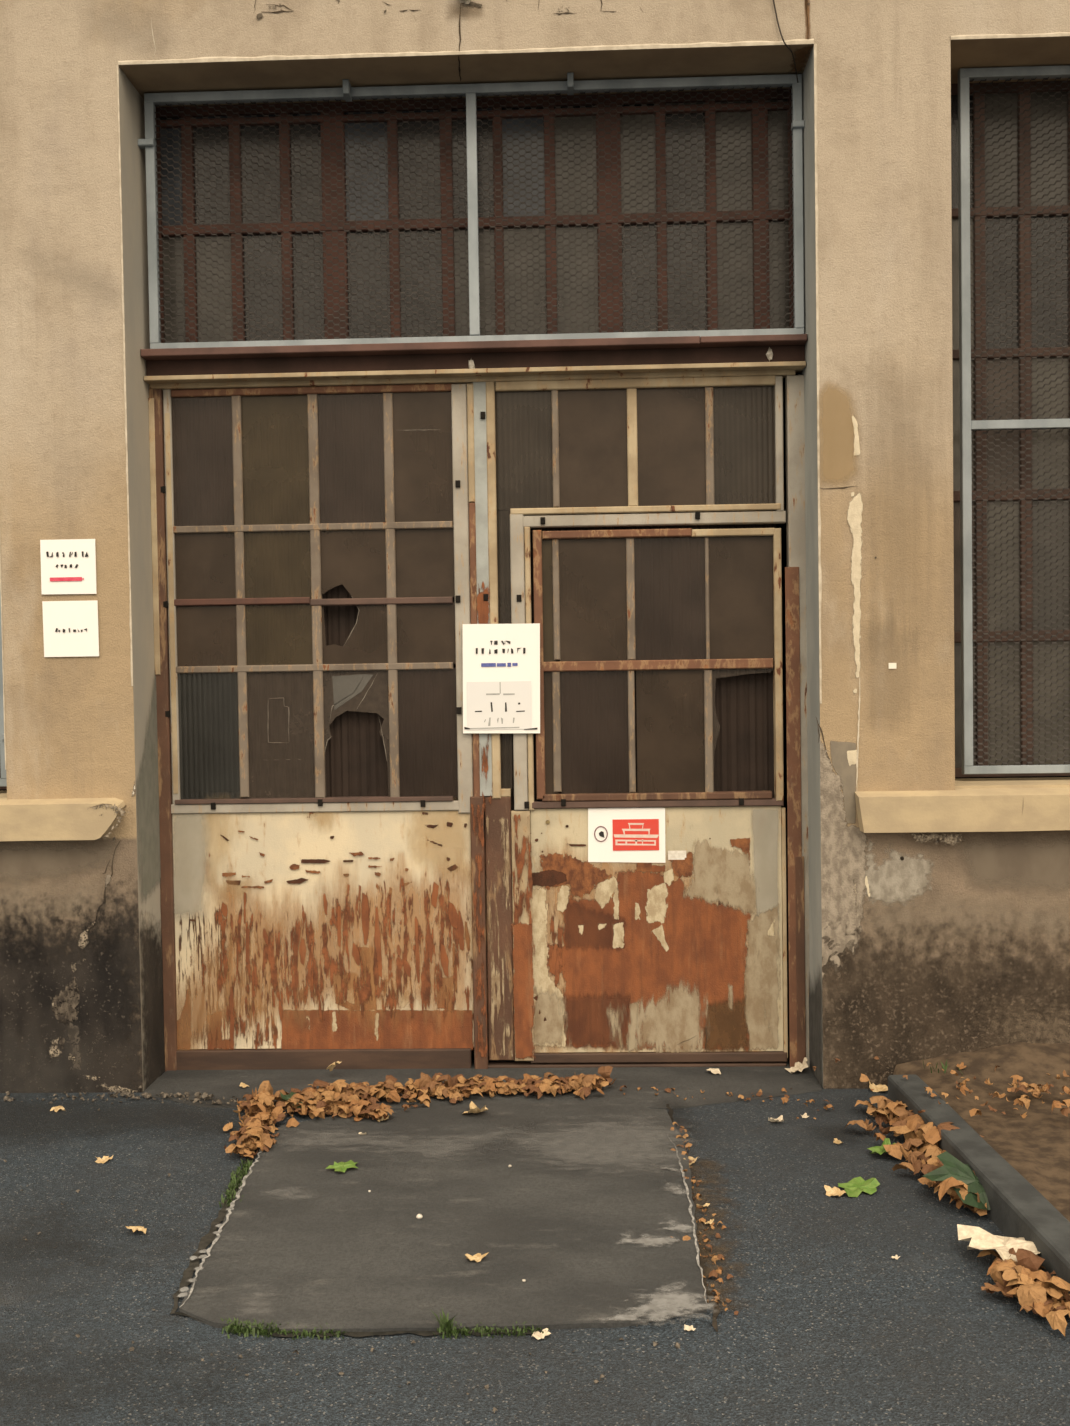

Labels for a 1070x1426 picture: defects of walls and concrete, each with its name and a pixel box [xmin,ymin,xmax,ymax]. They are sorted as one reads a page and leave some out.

peeling [852,415,860,457]
corrosion [477,582,490,624]
flaking render [820,492,962,982]
damp [0,675,206,1093]
peeling [222,852,412,889]
corrosion [177,733,492,1057]
peeling [486,814,570,1059]
corrosion [530,825,751,1052]
peeling [608,983,707,1053]
peeling [578,839,757,951]
damp [809,930,1070,1089]
damp [962,837,1070,890]